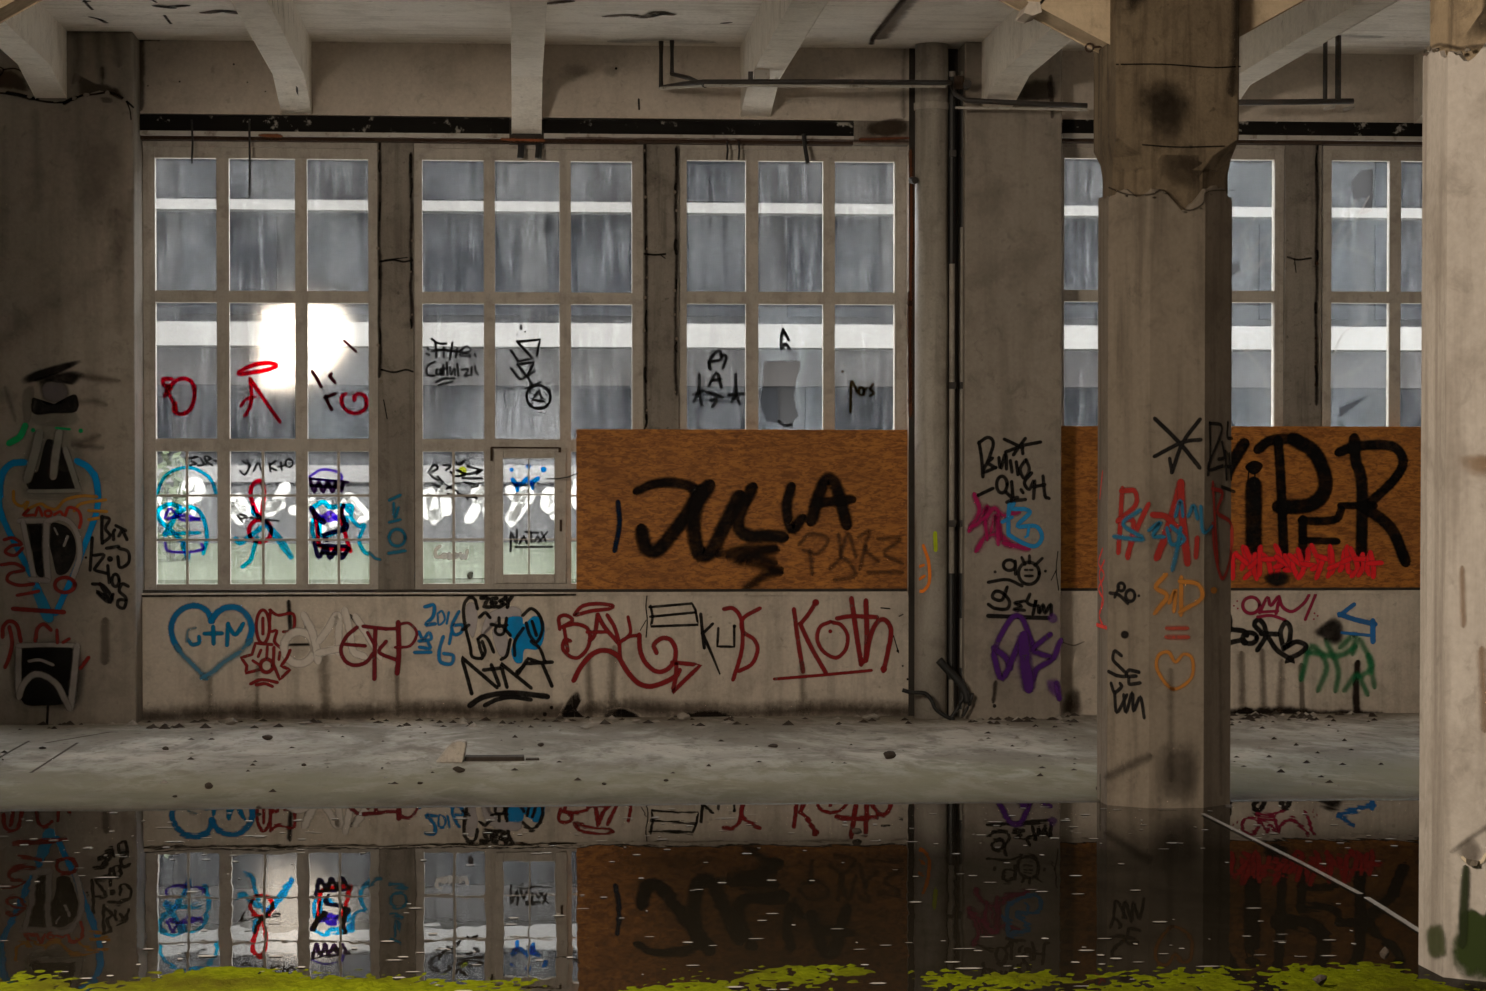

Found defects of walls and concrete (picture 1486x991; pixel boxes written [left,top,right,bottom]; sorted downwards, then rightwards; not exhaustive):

damp [1229,0,1240,97]
spalling [0,67,134,120]
damp [1146,89,1186,127]